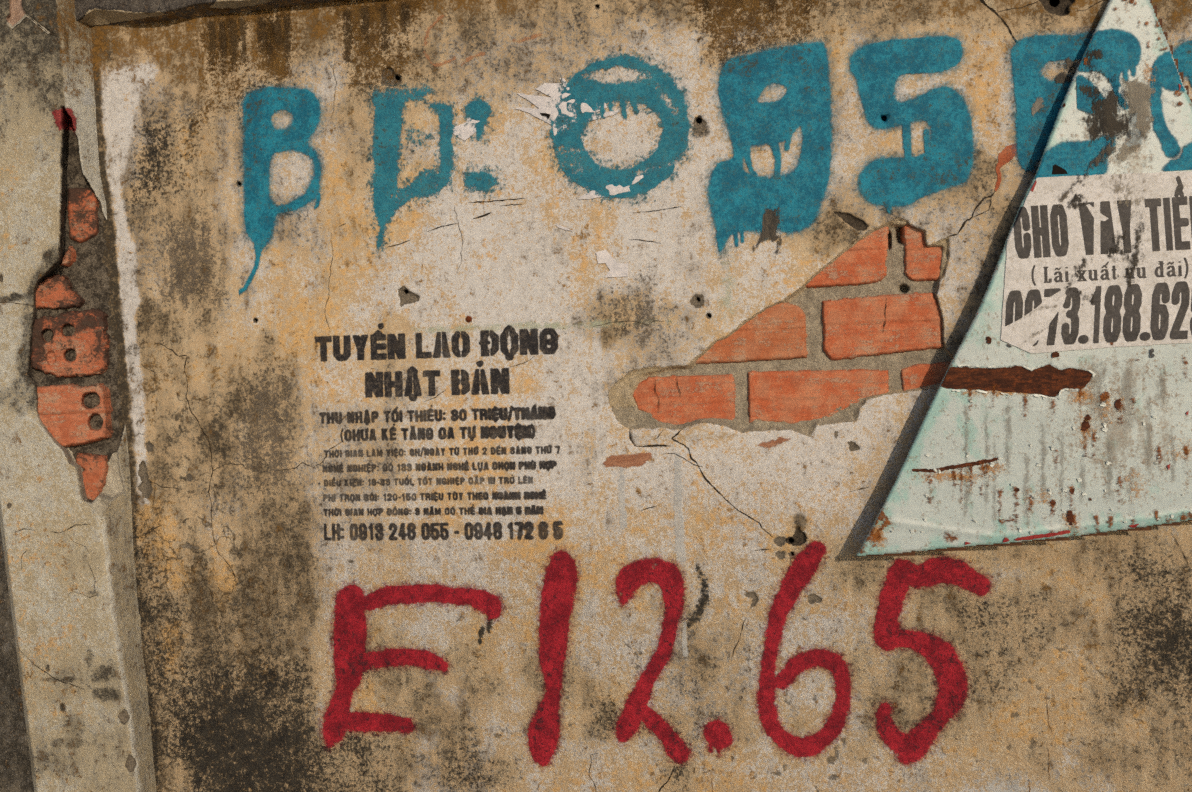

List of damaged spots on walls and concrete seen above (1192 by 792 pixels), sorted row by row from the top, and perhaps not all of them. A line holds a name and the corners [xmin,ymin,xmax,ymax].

damp [126,6,301,208]
damp [327,0,426,94]
damp [686,0,827,66]
crack [981,0,1038,43]
flaking render [28,108,154,520]
flaking render [608,211,953,451]
crack [142,343,249,581]
crack [629,429,774,538]
damp [132,512,394,792]
damp [1094,546,1192,715]